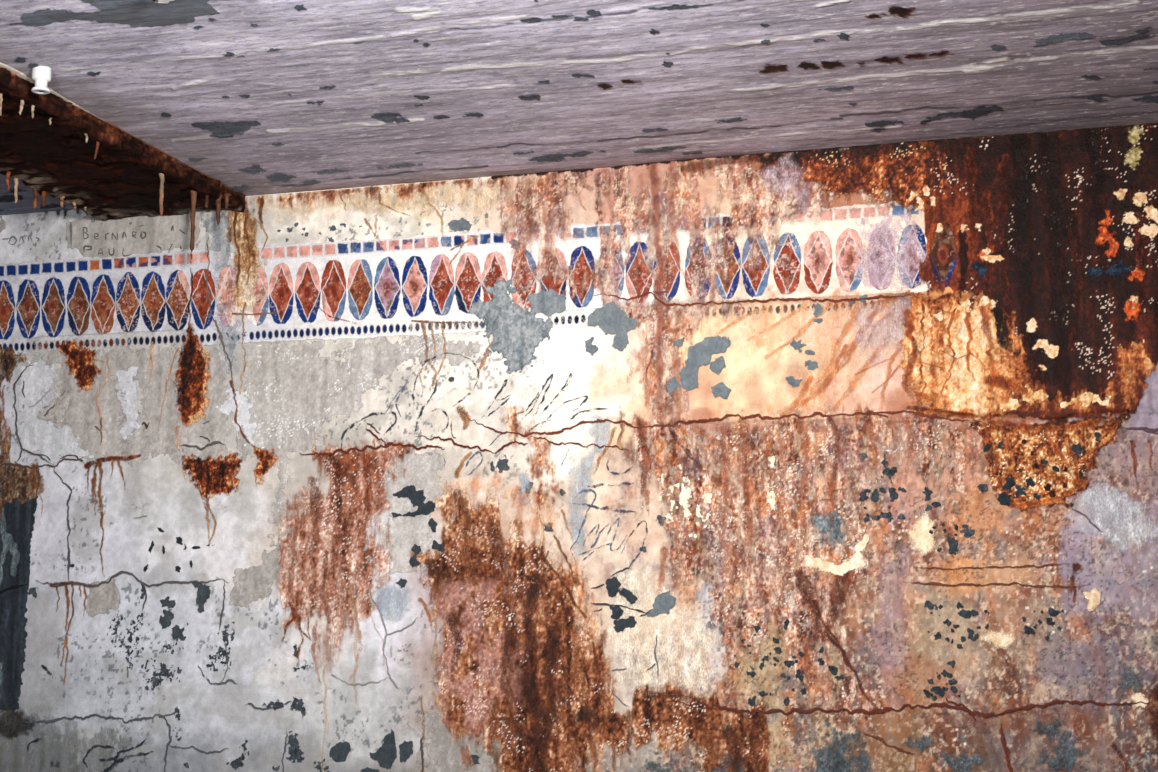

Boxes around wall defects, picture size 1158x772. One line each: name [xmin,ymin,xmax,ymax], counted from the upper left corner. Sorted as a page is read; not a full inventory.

peeling [21,0,220,30]
peeling [585,302,637,355]
damp [0,507,19,582]
rust [0,344,44,518]
rust [58,340,141,572]
crack [0,365,291,772]
peeling [15,279,566,608]
crack [300,409,994,456]
rust [161,123,1158,772]
spalling [970,409,1130,512]
damp [0,705,130,772]
crack [590,567,1157,772]